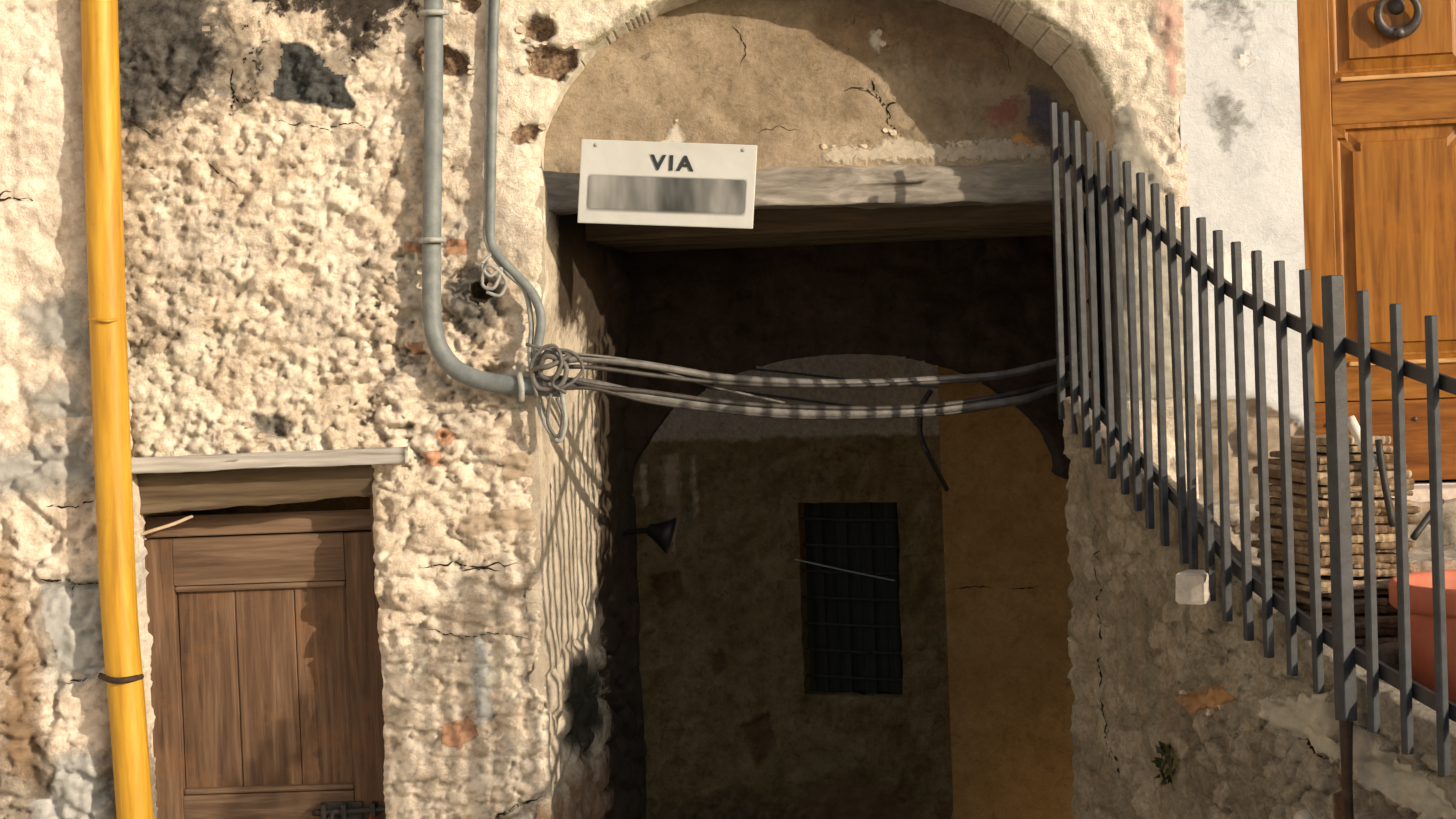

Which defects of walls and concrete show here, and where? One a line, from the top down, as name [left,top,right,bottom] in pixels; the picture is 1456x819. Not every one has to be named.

damp [1193,0,1245,14]
damp [118,0,420,145]
spalling [516,12,582,82]
crack [844,80,901,136]
crack [425,561,515,571]
crack [427,629,527,639]